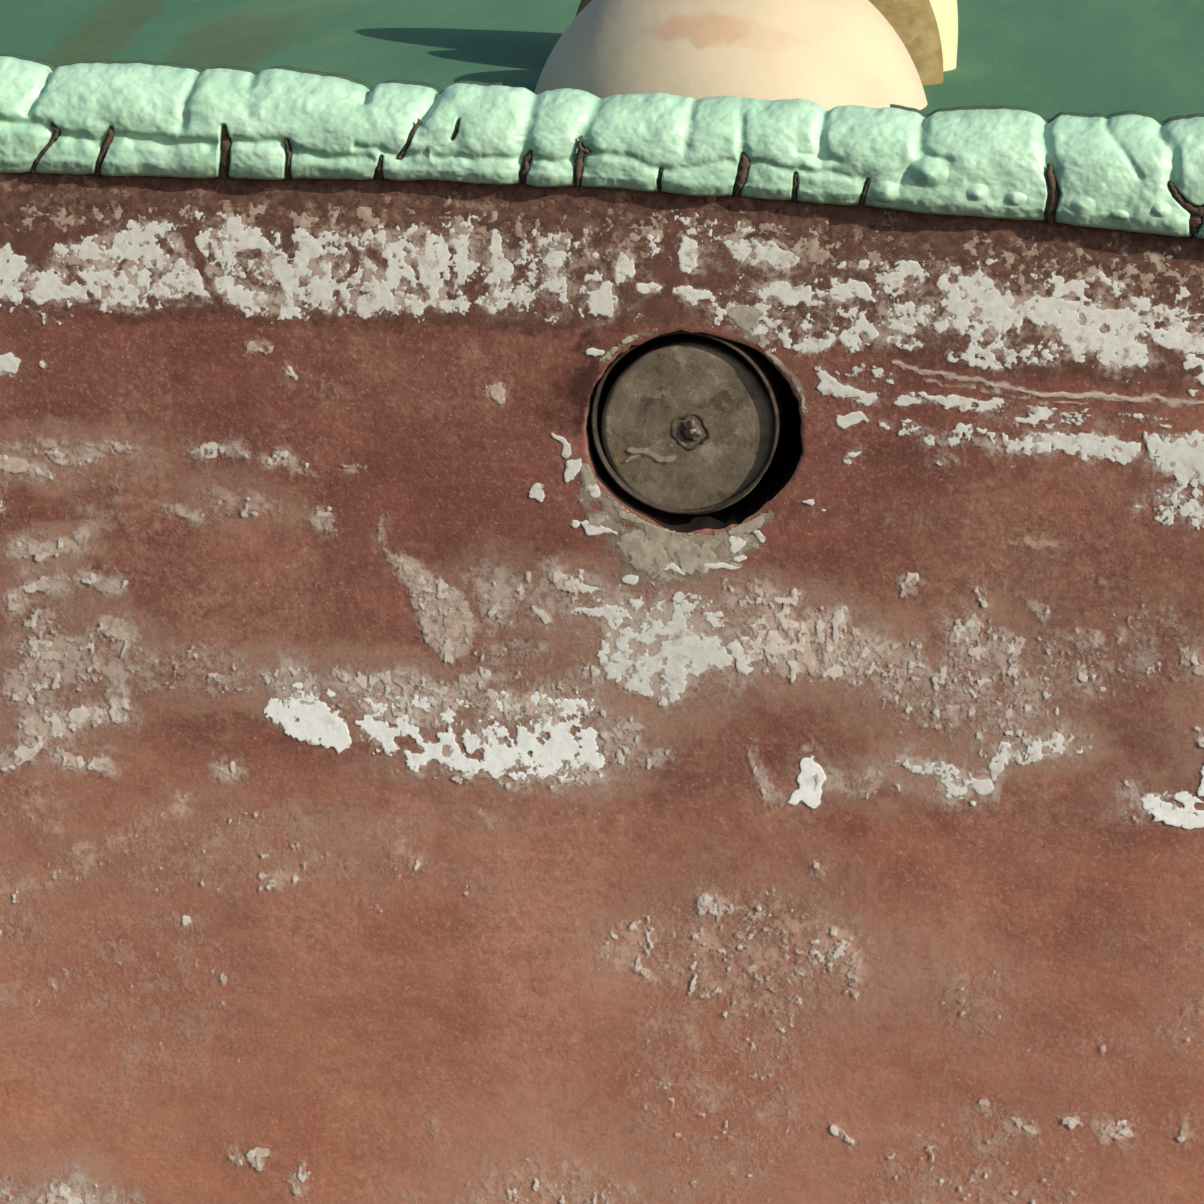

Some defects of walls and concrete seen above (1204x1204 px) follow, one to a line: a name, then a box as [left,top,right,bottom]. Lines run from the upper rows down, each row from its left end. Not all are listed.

crack [95,129,114,175]
crack [219,127,231,178]
crack [284,140,292,178]
crack [374,118,421,180]
crack [732,153,750,196]
crack [1044,164,1060,224]
crack [1168,183,1204,233]
peeling [0,164,1204,530]
spalling [551,433,774,586]
peeling [263,680,605,784]
peeling [788,755,826,808]
peeling [1140,766,1204,829]